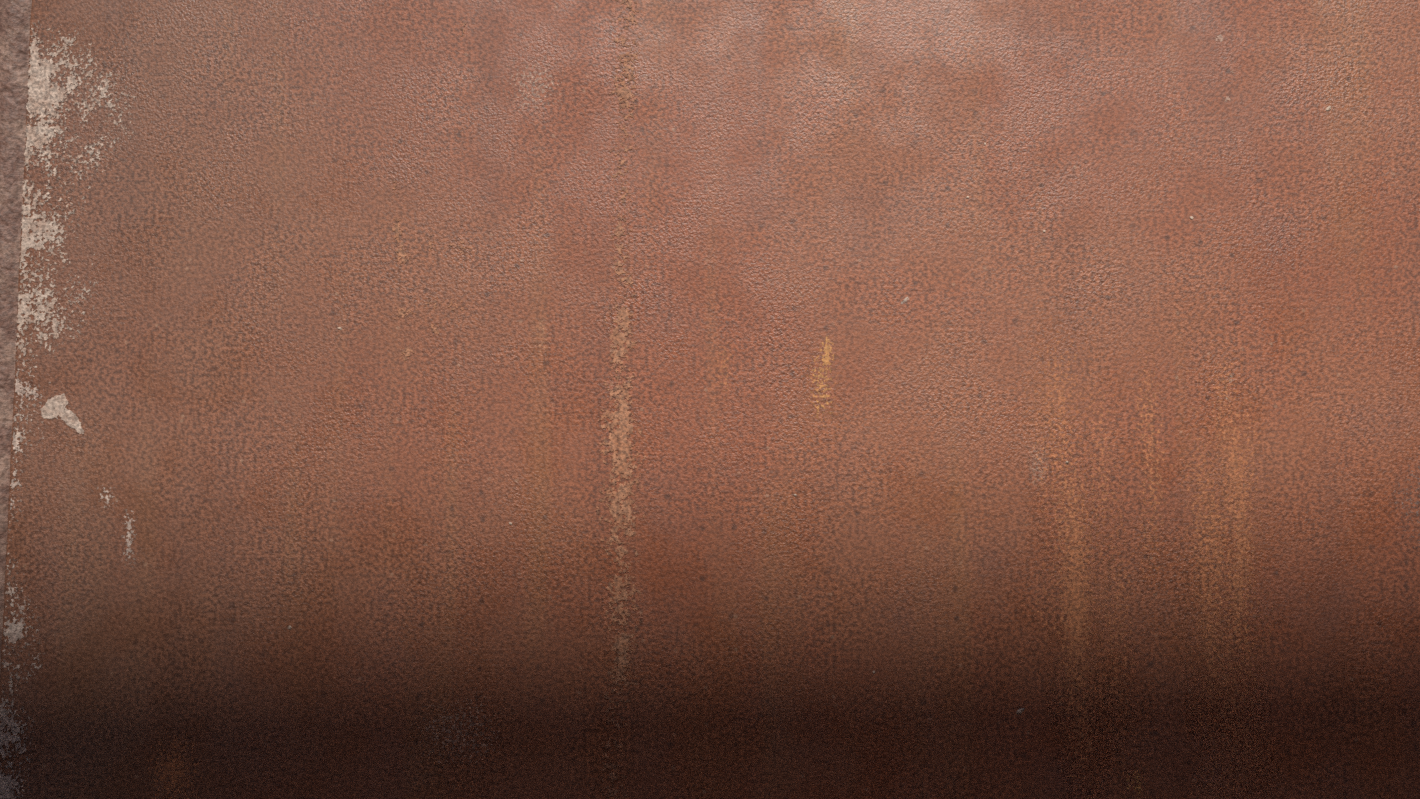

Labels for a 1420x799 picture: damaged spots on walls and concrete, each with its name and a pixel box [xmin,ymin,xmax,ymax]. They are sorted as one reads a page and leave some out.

water stain [0,20,137,799]
corrosion [804,336,842,447]
corrosion [1014,281,1282,799]